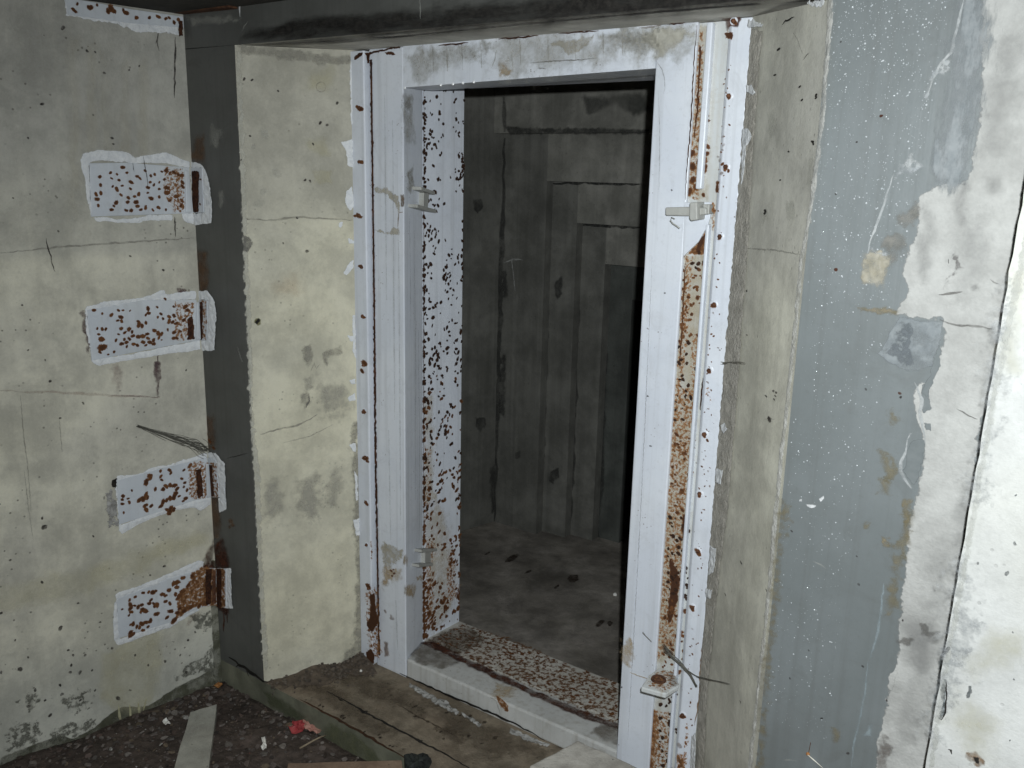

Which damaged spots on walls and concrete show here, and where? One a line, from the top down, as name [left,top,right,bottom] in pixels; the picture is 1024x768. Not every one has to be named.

rust [725,17,741,40]
rust [94,166,202,213]
rust [92,254,207,355]
rust [405,90,621,728]
rust [624,31,731,768]
peeling [861,0,1024,768]
rust [120,461,234,528]
rust [121,539,229,638]